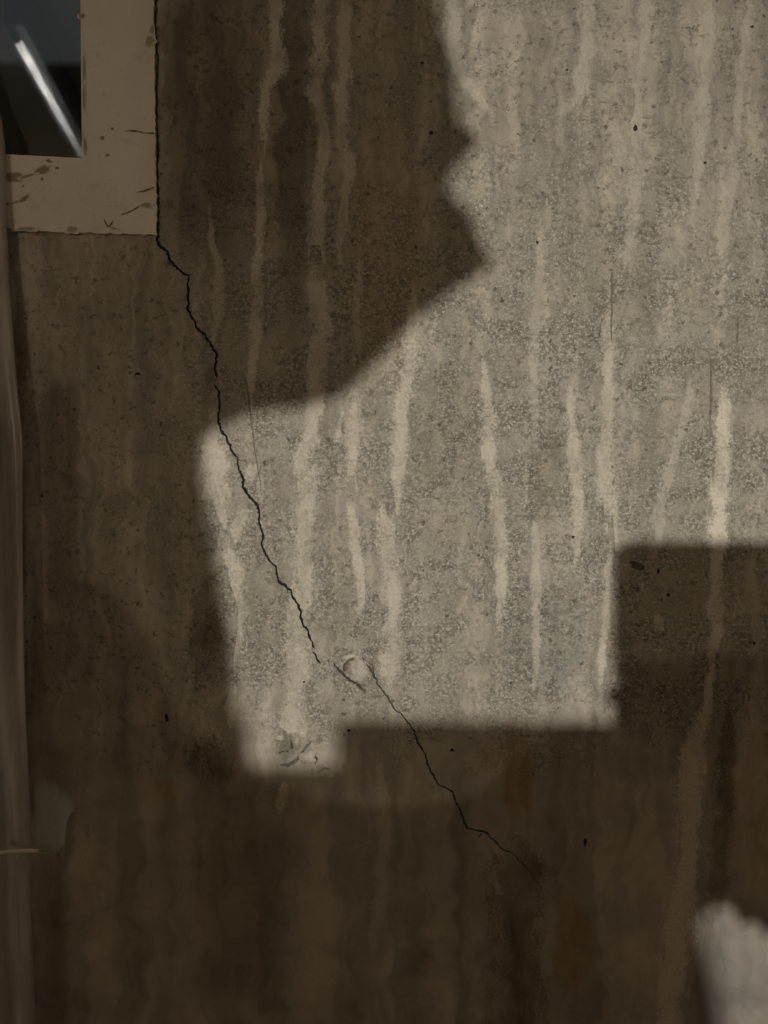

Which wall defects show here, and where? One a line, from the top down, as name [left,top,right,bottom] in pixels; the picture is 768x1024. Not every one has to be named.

efflorescence [435,0,497,155]
efflorescence [683,0,757,305]
leakage [22,770,98,893]
leakage [162,0,428,1024]
crack [154,0,539,884]
efflorescence [476,335,548,700]
leakage [459,815,572,1024]
leakage [524,195,548,485]
leakage [554,0,661,725]
leakage [642,355,768,1024]